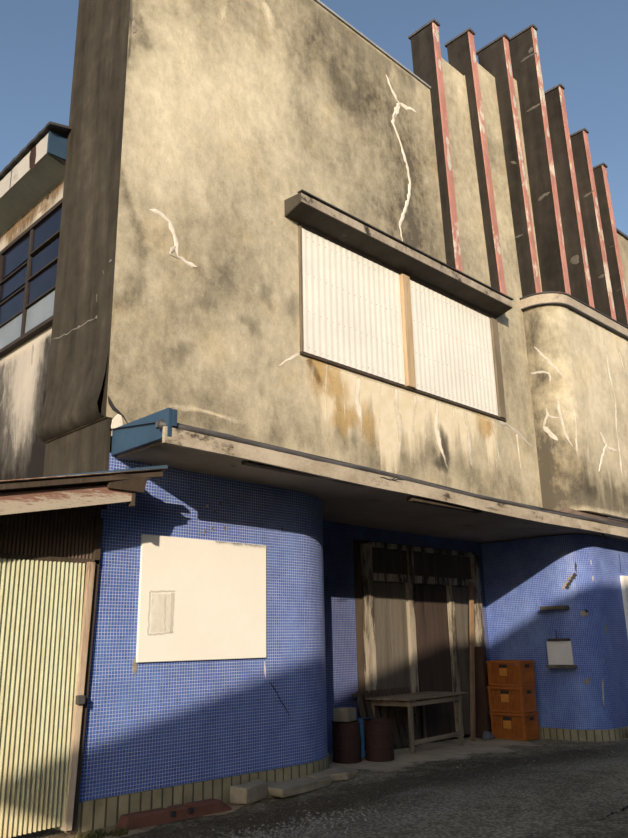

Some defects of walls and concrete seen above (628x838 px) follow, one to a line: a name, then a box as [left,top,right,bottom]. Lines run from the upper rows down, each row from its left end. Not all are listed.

crack [386,75,417,241]
crack [149,209,197,268]
crack [531,347,565,381]
crack [499,401,573,468]
crack [599,432,617,472]